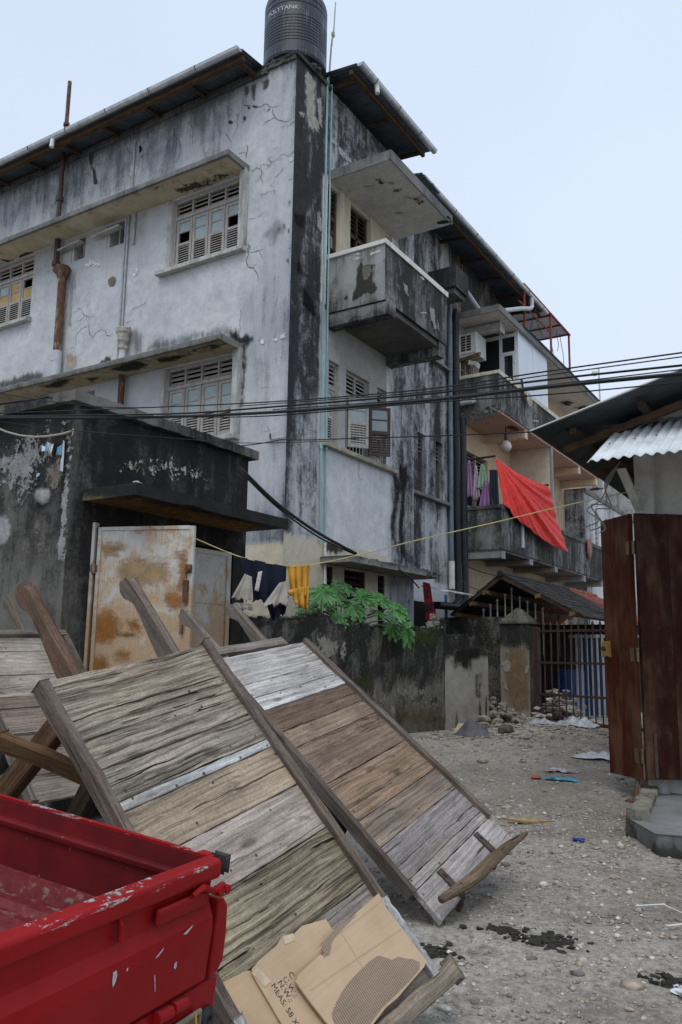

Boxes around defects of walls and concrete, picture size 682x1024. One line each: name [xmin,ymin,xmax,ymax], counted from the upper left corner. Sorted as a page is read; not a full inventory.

peeling [299,72,323,132]
leakage [153,173,233,193]
crack [226,104,295,219]
leakage [303,288,318,318]
leakage [391,465,408,562]
corrosion [101,544,188,608]
corrosion [95,611,139,643]
corrosion [93,652,129,670]
leakage [446,649,481,697]